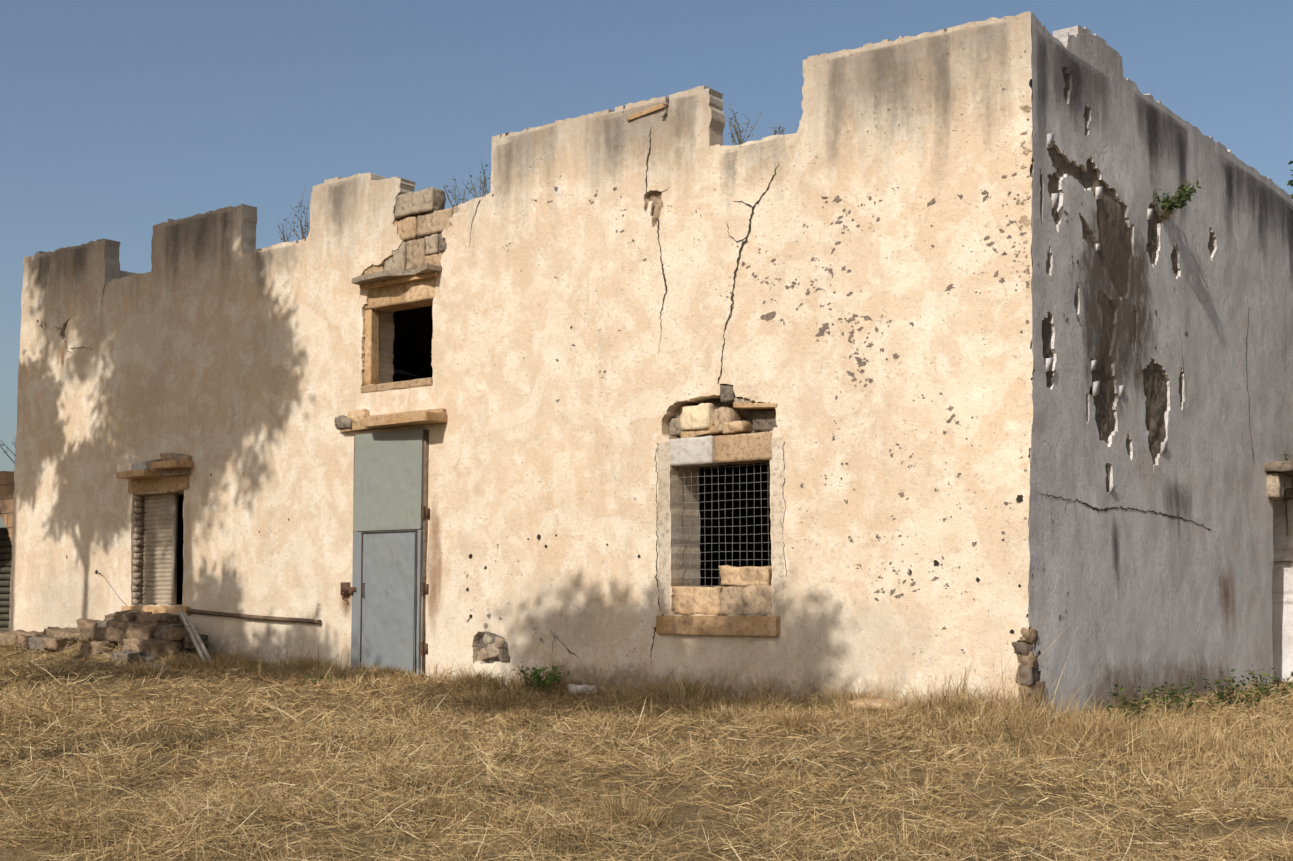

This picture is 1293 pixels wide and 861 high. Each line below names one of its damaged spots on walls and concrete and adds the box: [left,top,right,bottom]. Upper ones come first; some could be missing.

water stain [1141,104,1185,180]
crack [645,129,670,351]
crack [718,164,779,383]
water stain [1082,203,1151,402]
water stain [1227,166,1293,254]
crack [1041,493,1212,531]
flaking render [466,544,511,663]
hole [874,534,981,601]
flaking render [1009,627,1046,716]